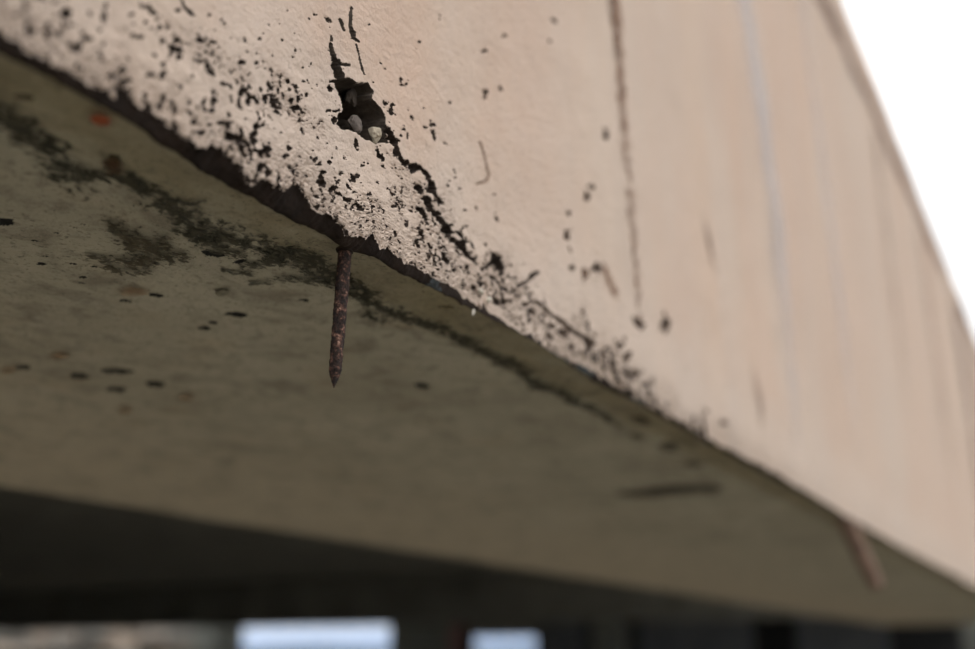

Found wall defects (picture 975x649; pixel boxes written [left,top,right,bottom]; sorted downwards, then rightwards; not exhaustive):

spalling [262,93,282,116]
spalling [329,77,388,144]
spalling [399,110,448,146]
spalling [248,138,272,159]
spalling [255,162,272,178]
leakage [0,102,337,291]
spalling [201,250,247,265]
spalling [562,207,605,284]
spalling [197,312,247,330]
spalling [632,316,646,335]
spalling [659,310,673,336]
leakage [348,273,623,427]